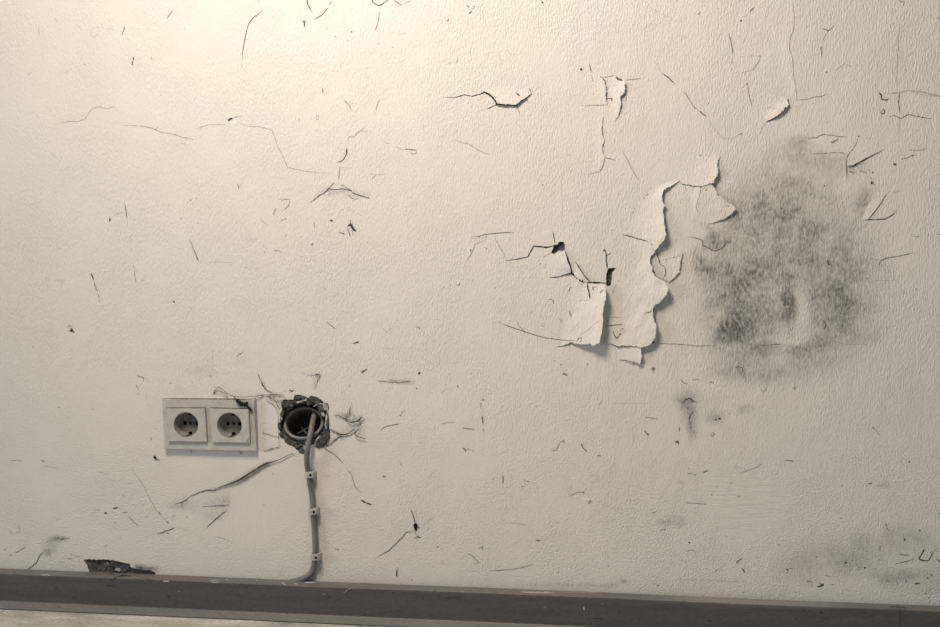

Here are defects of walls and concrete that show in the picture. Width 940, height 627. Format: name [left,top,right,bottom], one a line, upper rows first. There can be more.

crack [445,86,531,109]
peeling [586,76,641,122]
crack [879,92,931,119]
crack [505,233,555,261]
peeling [544,151,736,364]
leakage [718,264,771,343]
flaking render [278,395,330,454]
flaking render [84,559,156,574]